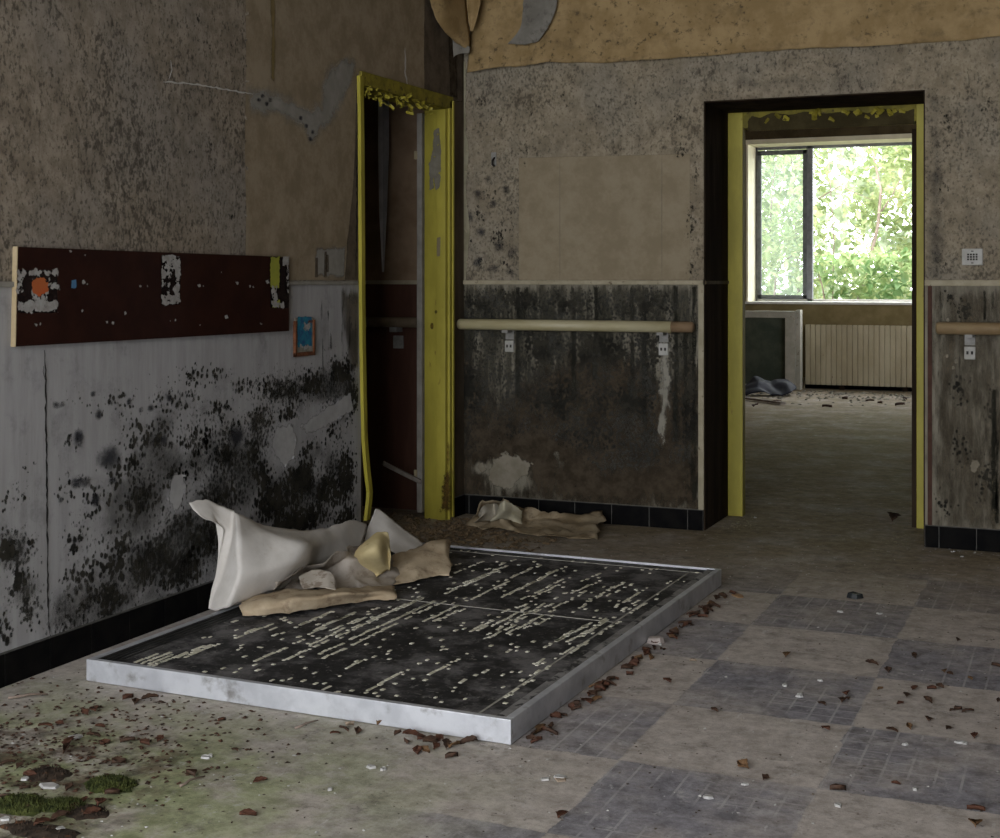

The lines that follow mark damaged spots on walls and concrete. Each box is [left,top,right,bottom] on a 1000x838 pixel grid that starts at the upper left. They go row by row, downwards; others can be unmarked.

water stain [0,291,358,646]
spalling [478,451,533,490]
water stain [464,285,698,509]
water stain [935,334,1000,529]
water stain [938,290,999,323]